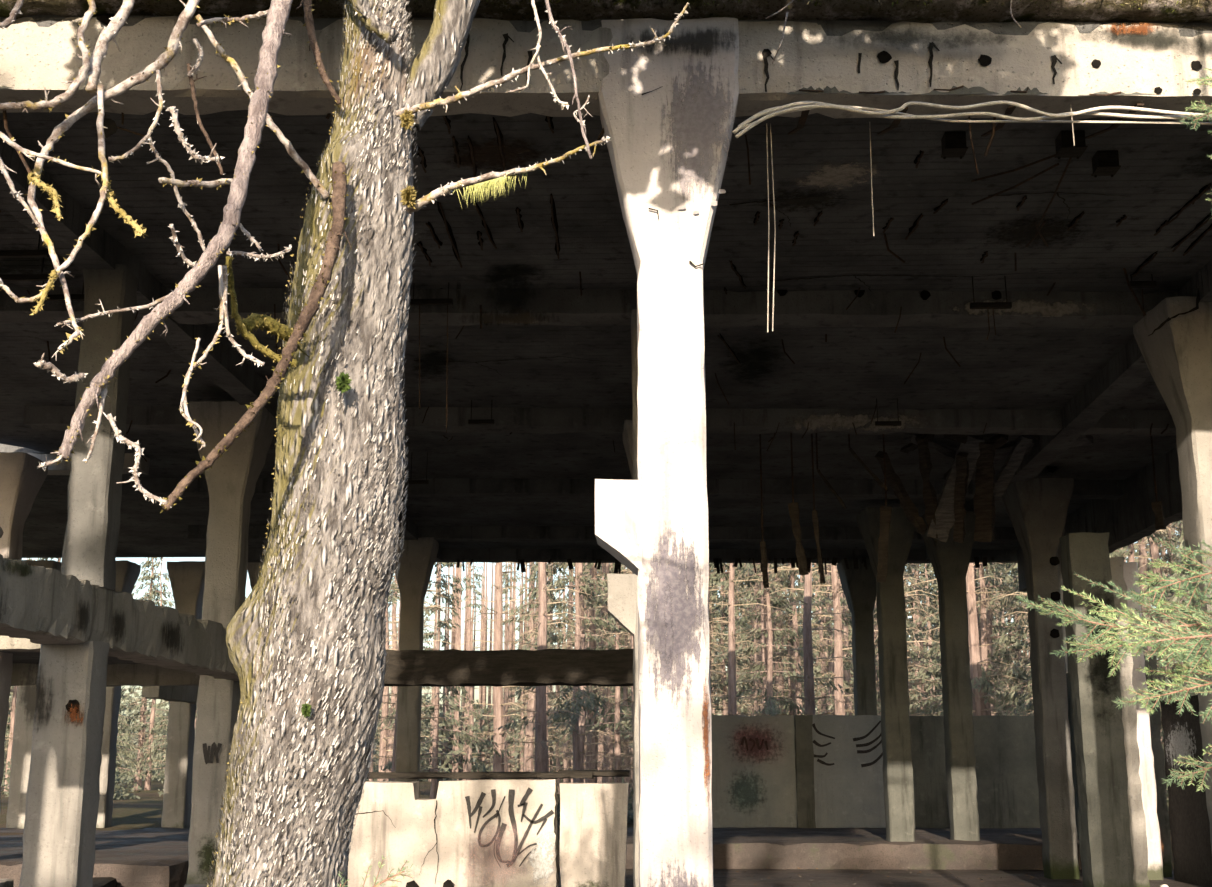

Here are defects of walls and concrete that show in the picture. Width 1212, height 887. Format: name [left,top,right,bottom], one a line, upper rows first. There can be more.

rust [1112,23,1158,34]
spalling [787,85,1047,95]
crack [1148,289,1200,336]
leakage [78,601,90,633]
rust [65,704,84,725]